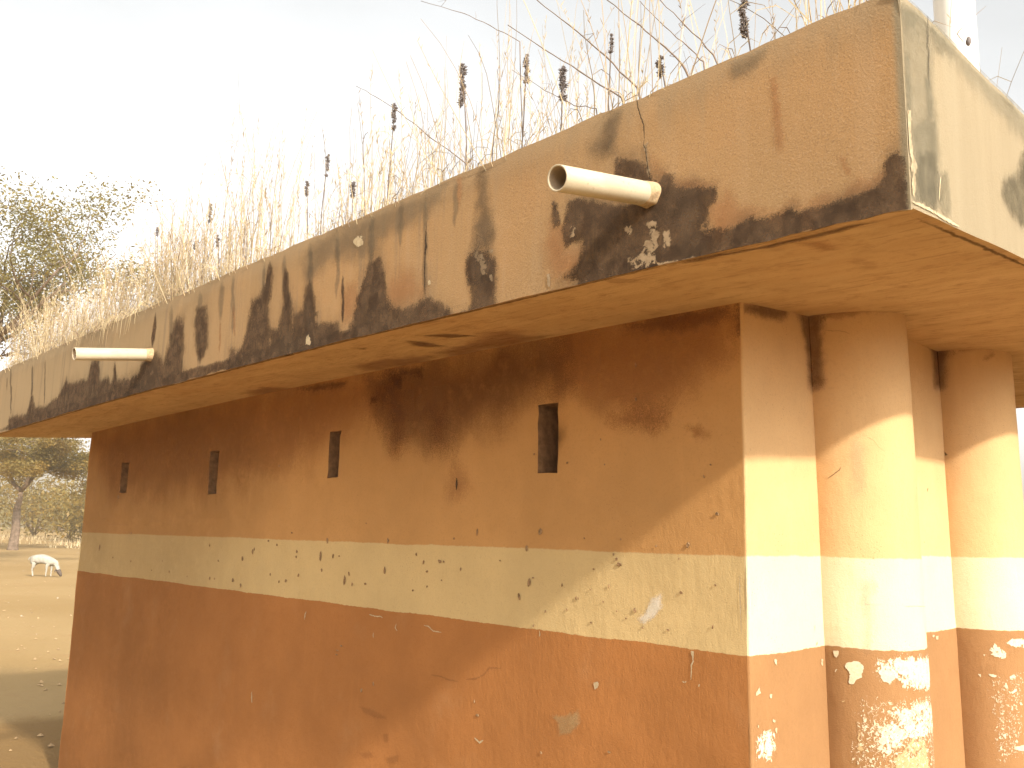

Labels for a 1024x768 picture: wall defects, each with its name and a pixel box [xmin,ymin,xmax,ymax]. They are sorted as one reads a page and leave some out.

crack [636,101,651,181]
water stain [2,123,937,441]
peeling [627,220,694,269]
water stain [934,226,1024,266]
peeling [984,638,1024,659]
peeling [835,653,935,768]
peeling [978,672,1024,761]